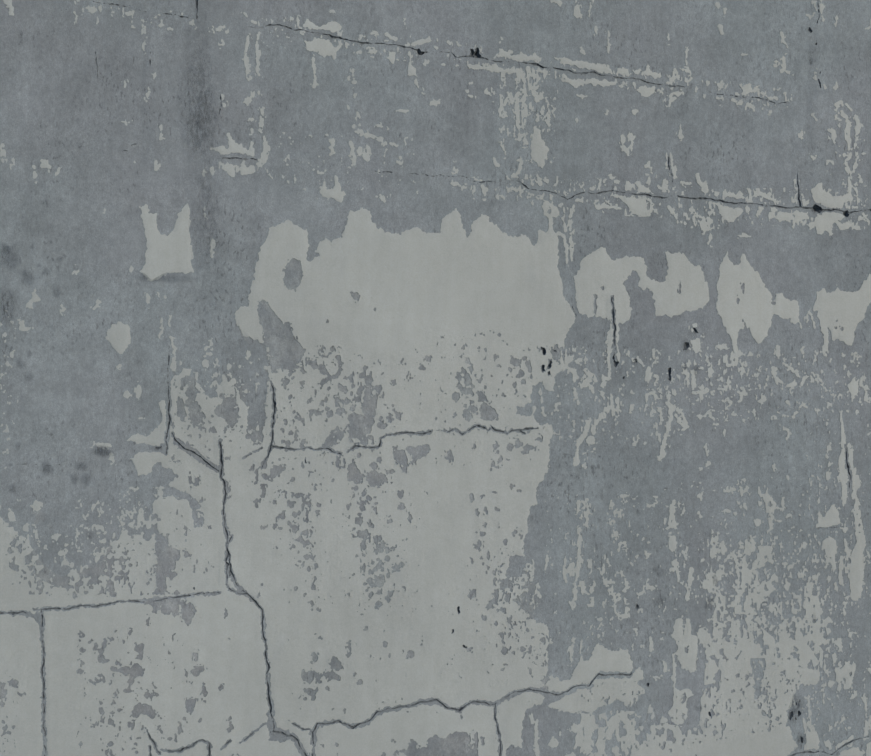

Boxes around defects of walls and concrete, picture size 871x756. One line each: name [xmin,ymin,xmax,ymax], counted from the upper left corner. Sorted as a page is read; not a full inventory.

peeling [73,0,197,55]
crack [93,0,198,19]
crack [254,24,684,87]
crack [375,171,495,183]
crack [517,157,870,214]
peeling [129,203,194,281]
crack [609,297,617,350]
crack [0,356,632,756]